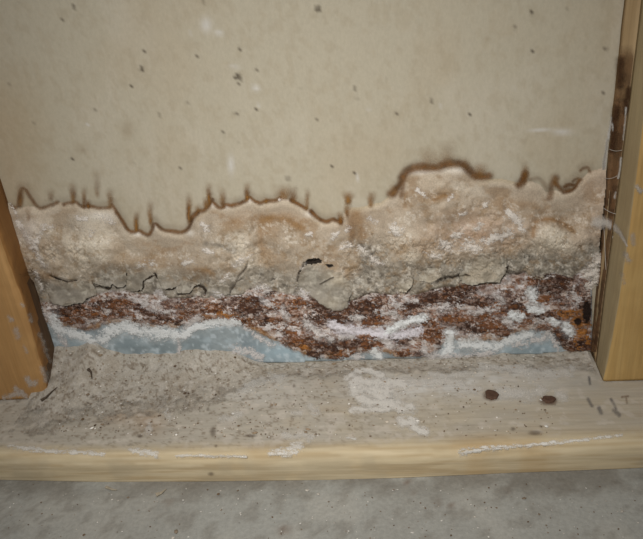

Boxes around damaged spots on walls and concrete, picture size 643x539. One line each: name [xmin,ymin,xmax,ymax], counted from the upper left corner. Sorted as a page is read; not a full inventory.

leakage [388,160,492,196]
leakage [549,166,590,198]
leakage [9,187,352,291]
efflorescence [339,241,384,265]
efflorescence [425,208,526,259]
crack [68,273,207,306]
crack [437,265,525,286]
corrosion [41,268,592,360]